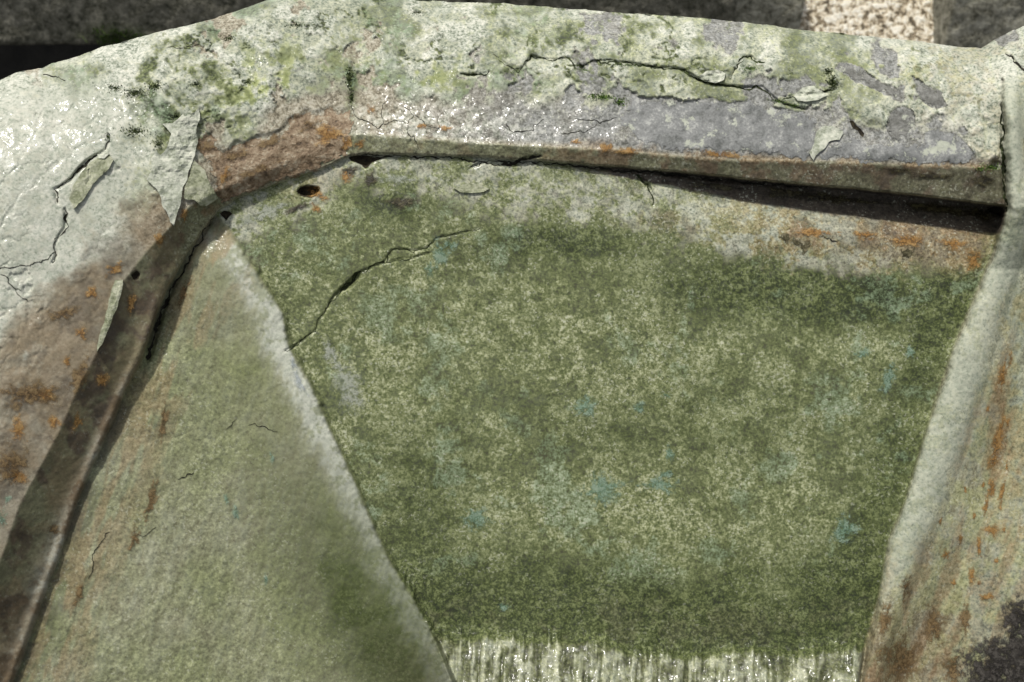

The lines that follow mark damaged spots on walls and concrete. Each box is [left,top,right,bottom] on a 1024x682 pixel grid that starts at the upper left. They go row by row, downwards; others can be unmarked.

crack [351,103,808,203]
crack [460,54,837,110]
spalling [619,62,975,166]
crack [0,141,109,301]
crack [146,218,213,360]
crack [285,228,480,351]
corrosion [973,415,1010,519]
corrosion [977,526,1006,557]
corrosion [873,567,994,682]